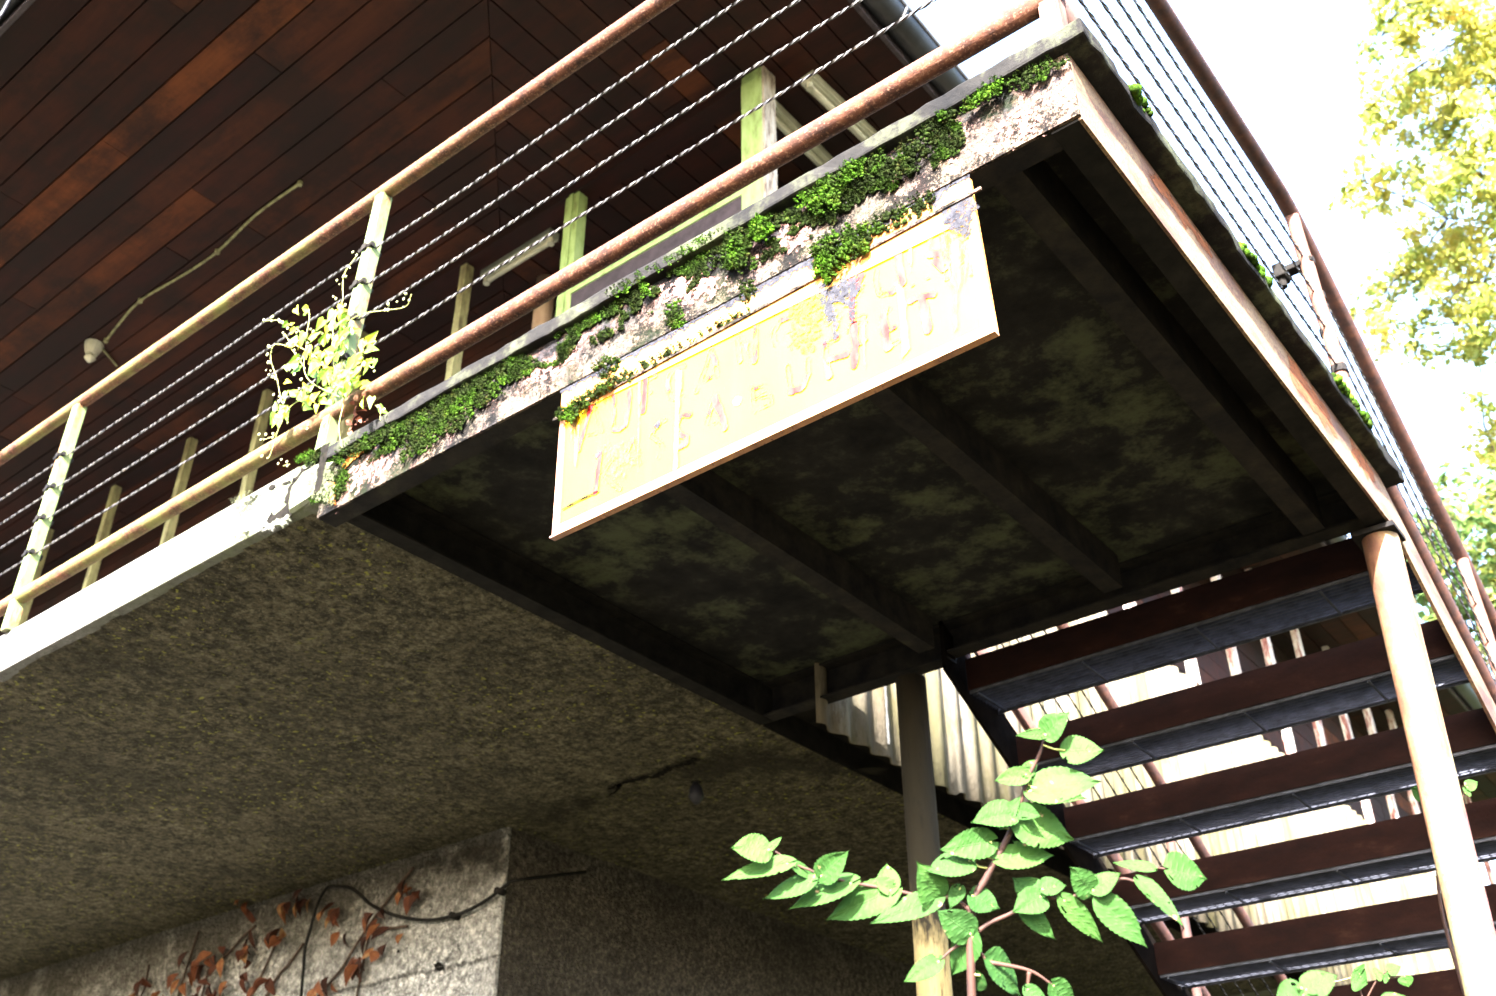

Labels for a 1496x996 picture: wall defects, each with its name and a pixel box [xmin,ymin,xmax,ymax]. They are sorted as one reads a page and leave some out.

leakage [560,175,979,394]
rust [908,233,973,329]
rust [1150,175,1213,258]
rust [1285,349,1378,489]
rust [1409,605,1448,747]
rust [1440,785,1496,939]